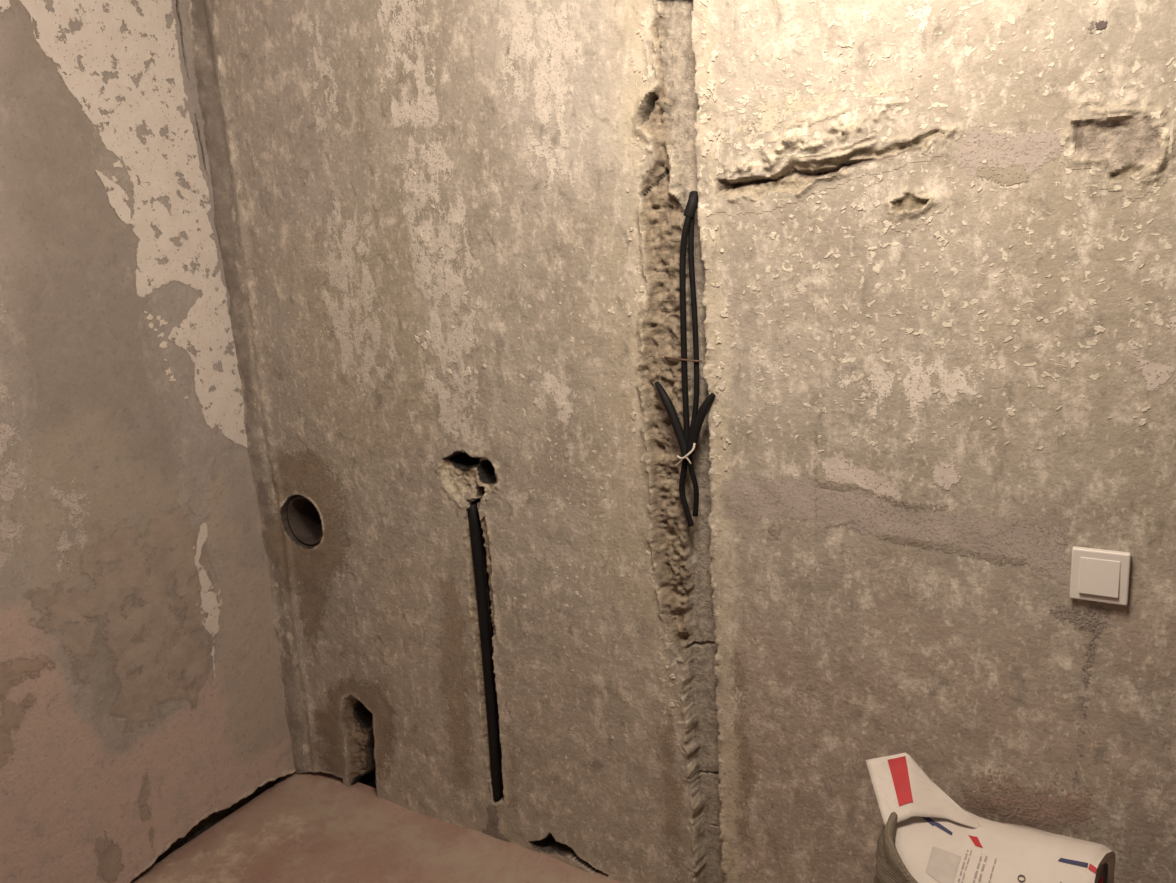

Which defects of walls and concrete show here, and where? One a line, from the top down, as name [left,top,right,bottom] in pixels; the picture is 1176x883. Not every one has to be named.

peeling [0,0,247,448]
peeling [533,356,589,458]
spalling [608,15,695,685]
spalling [699,0,968,274]
peeling [830,314,981,444]
crack [125,768,296,883]